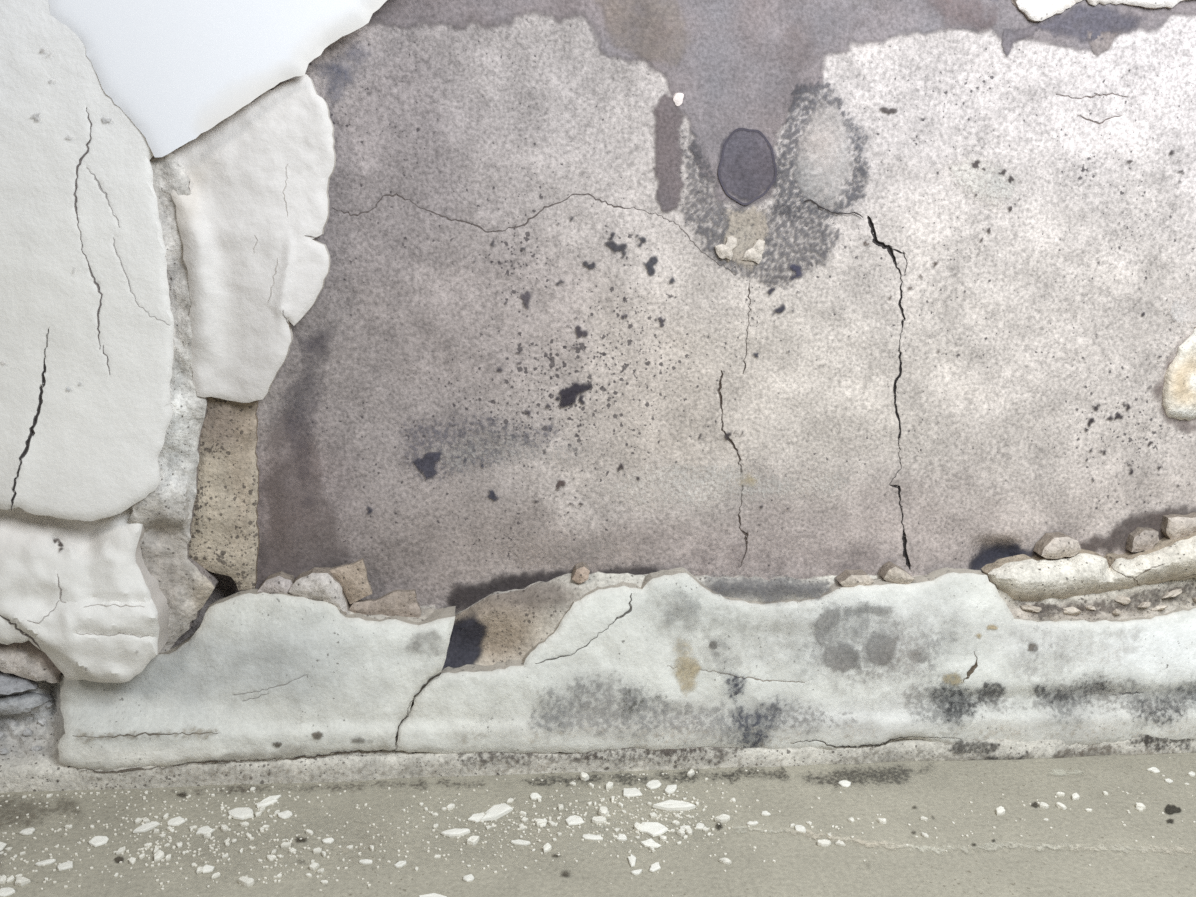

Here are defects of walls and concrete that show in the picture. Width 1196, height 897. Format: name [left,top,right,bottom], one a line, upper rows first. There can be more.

crack [11,329,49,511]
crack [74,107,169,373]
peeling [0,0,387,653]
crack [253,236,290,325]
crack [333,193,751,568]
water stain [369,0,1196,294]
crack [804,199,911,569]
spalling [1155,327,1196,431]
crack [535,593,632,664]
peeling [0,532,1196,771]
water stain [810,603,1007,723]
water stain [1023,678,1196,751]